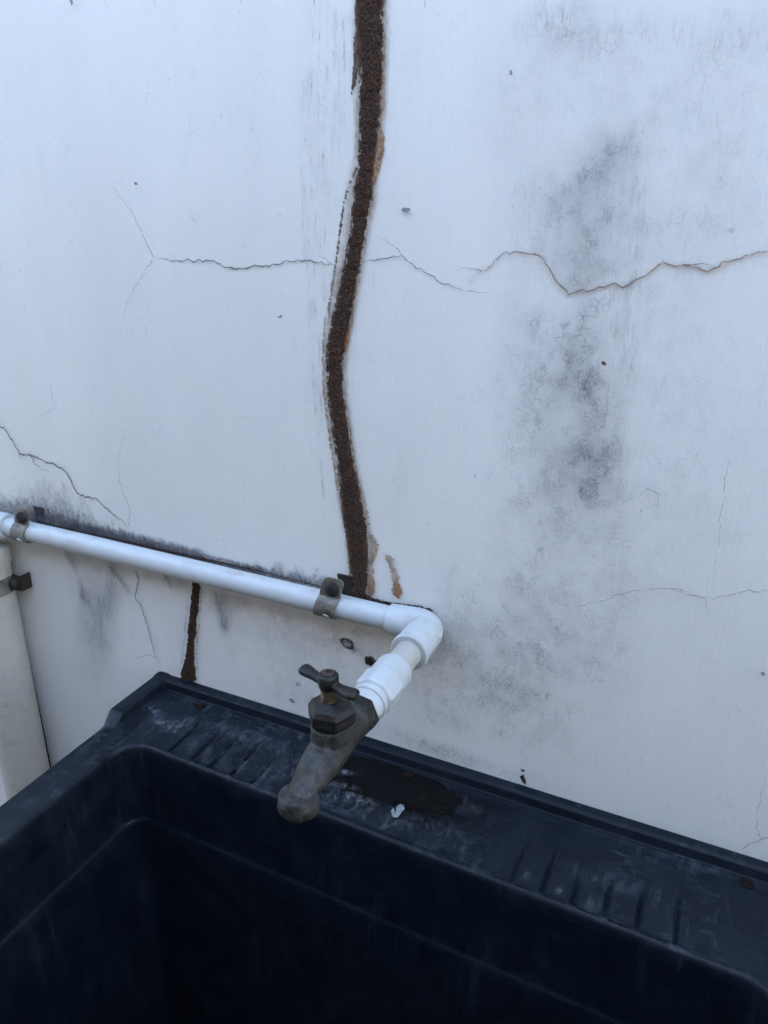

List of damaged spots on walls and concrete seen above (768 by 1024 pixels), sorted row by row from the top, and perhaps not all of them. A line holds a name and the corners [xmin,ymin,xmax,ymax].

crack [116,193,331,317]
crack [370,239,764,295]
crack [0,426,130,524]
water stain [0,501,322,588]
corrosion [385,555,402,599]